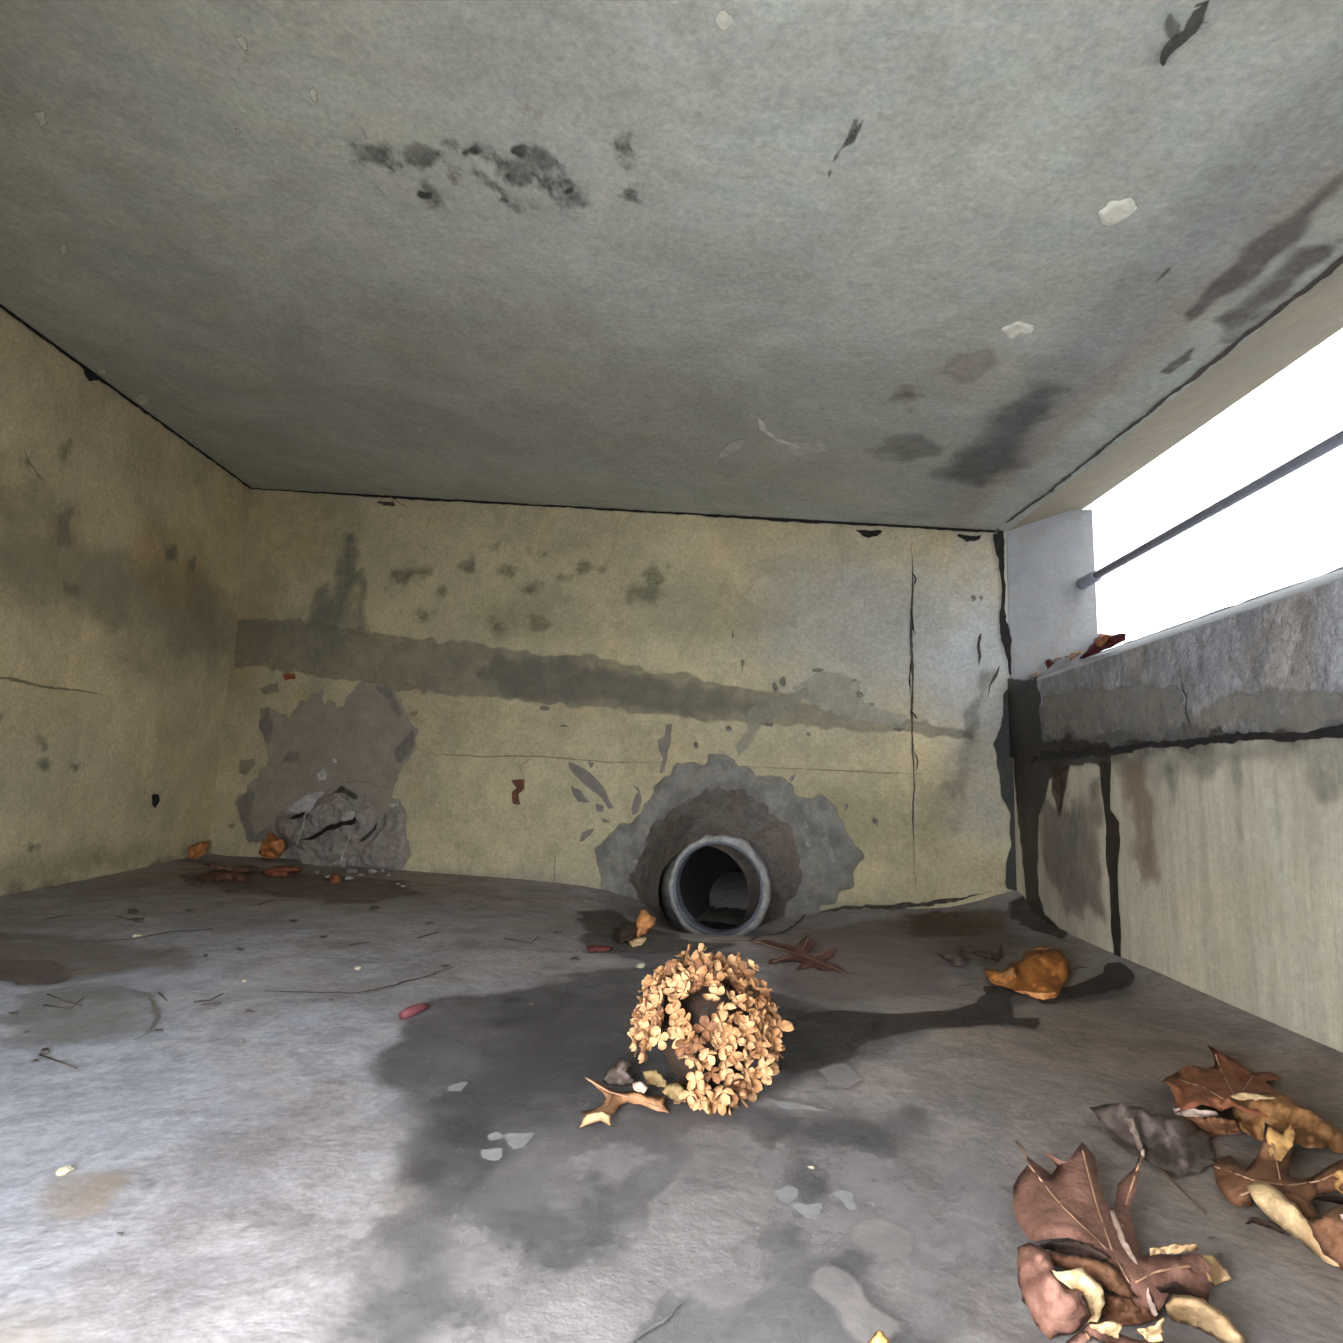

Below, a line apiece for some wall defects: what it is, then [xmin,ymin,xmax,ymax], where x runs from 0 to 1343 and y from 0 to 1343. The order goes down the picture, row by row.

damp [497,145,556,186]
damp [1187,180,1343,325]
damp [1161,349,1194,374]
damp [951,389,1057,484]
damp [236,535,854,728]
crack [0,255,1343,942]
peeling [235,683,418,860]
spalling [569,761,613,842]
spalling [632,785,641,815]
damp [993,677,1207,928]
damp [731,962,1134,1094]
damp [346,967,1016,1343]